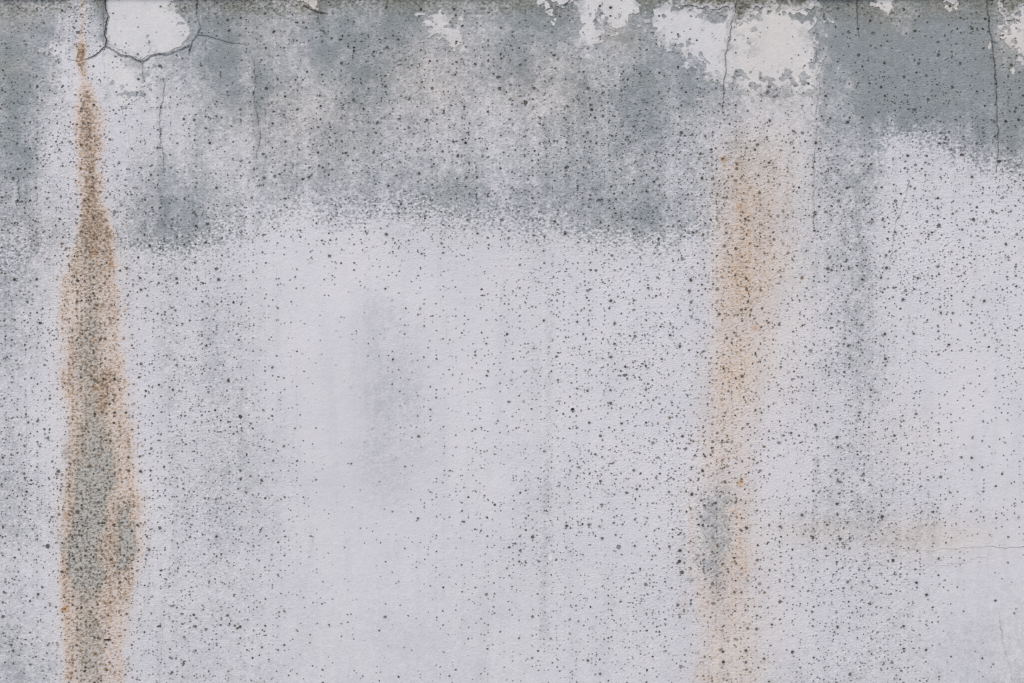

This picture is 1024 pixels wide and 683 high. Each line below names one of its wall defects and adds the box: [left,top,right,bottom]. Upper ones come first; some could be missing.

peeling [103,0,190,109]
crack [68,0,260,170]
peeling [414,9,469,53]
peeling [531,0,834,106]
crack [722,0,738,107]
crack [986,0,999,172]
corrosion [25,0,176,683]
leakage [103,0,740,683]
corrosion [637,86,846,683]